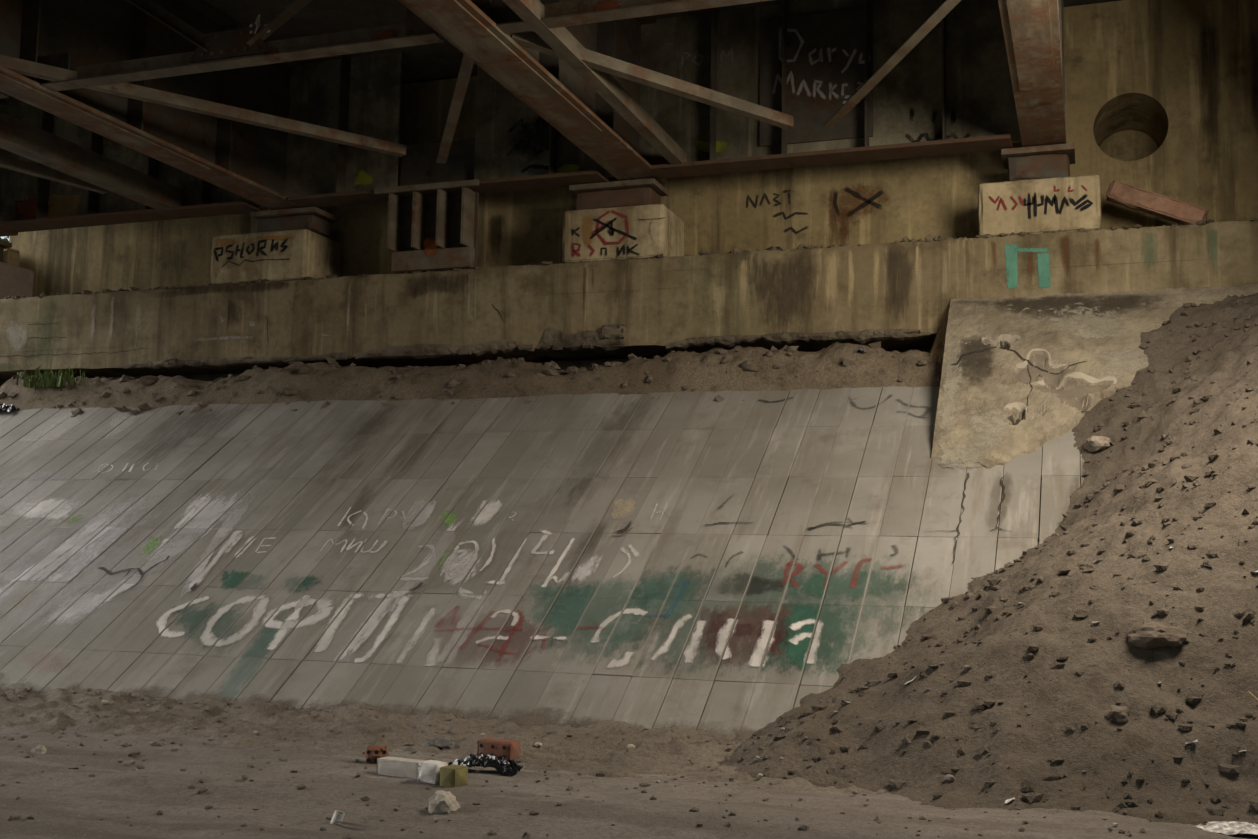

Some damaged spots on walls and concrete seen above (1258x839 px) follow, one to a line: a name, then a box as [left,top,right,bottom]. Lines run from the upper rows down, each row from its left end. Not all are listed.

leakage [826,251,853,300]
leakage [874,246,919,308]
spalling [980,334,1021,350]
crack [952,346,1087,420]
spalling [1003,402,1047,425]
spalling [1015,348,1117,412]
crack [927,473,970,563]
crack [991,477,1009,531]